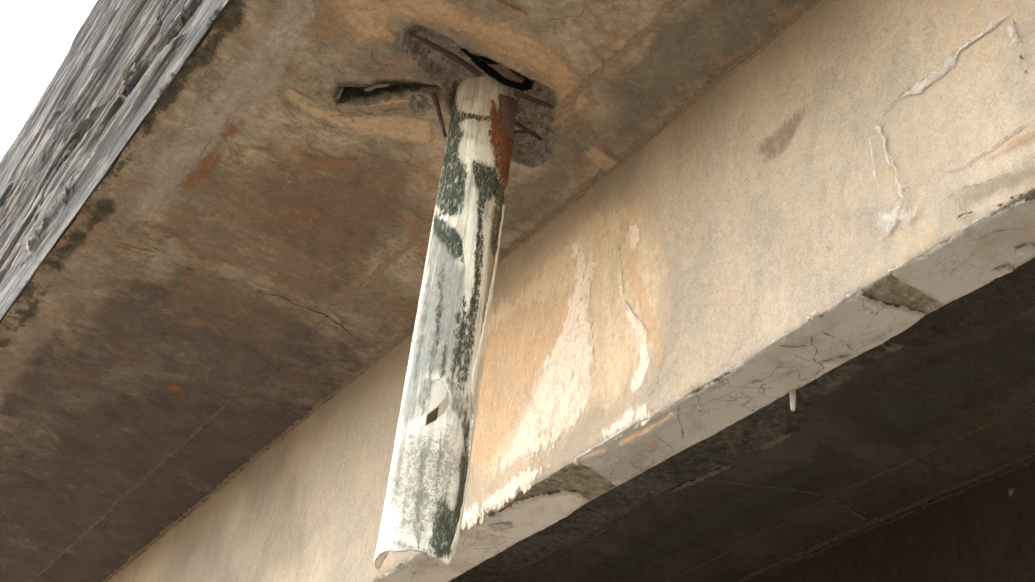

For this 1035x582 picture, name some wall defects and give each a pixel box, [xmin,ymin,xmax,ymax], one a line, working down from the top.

water stain [111,0,432,293]
spalling [398,23,560,168]
water stain [611,0,784,135]
crack [874,14,1027,167]
crack [941,123,1028,202]
water stain [0,257,365,582]
crack [94,238,350,334]
peeling [574,224,925,486]
peeling [888,194,1035,305]